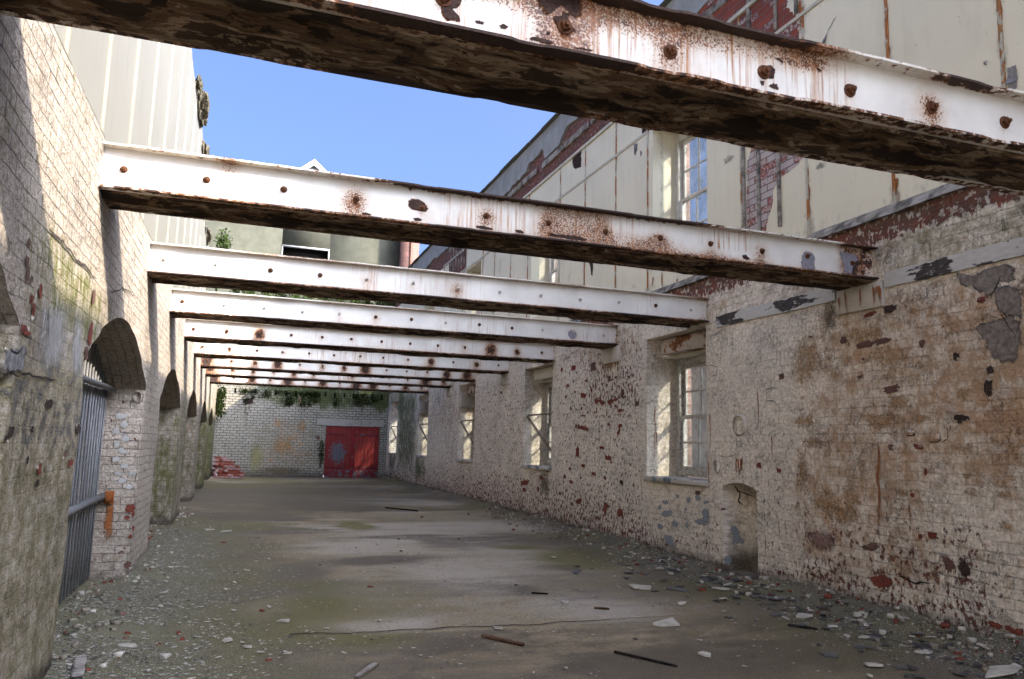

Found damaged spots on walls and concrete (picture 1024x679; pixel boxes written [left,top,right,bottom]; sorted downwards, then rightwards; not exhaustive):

corrosion [760,58,783,90]
corrosion [408,198,428,221]
corrosion [548,232,587,241]
flaking render [746,148,802,231]
peeling [4,238,96,374]
flaking render [953,264,1024,397]
spalling [565,362,639,435]
damp [795,414,817,485]
corrosion [104,504,114,539]
peeling [657,489,709,547]